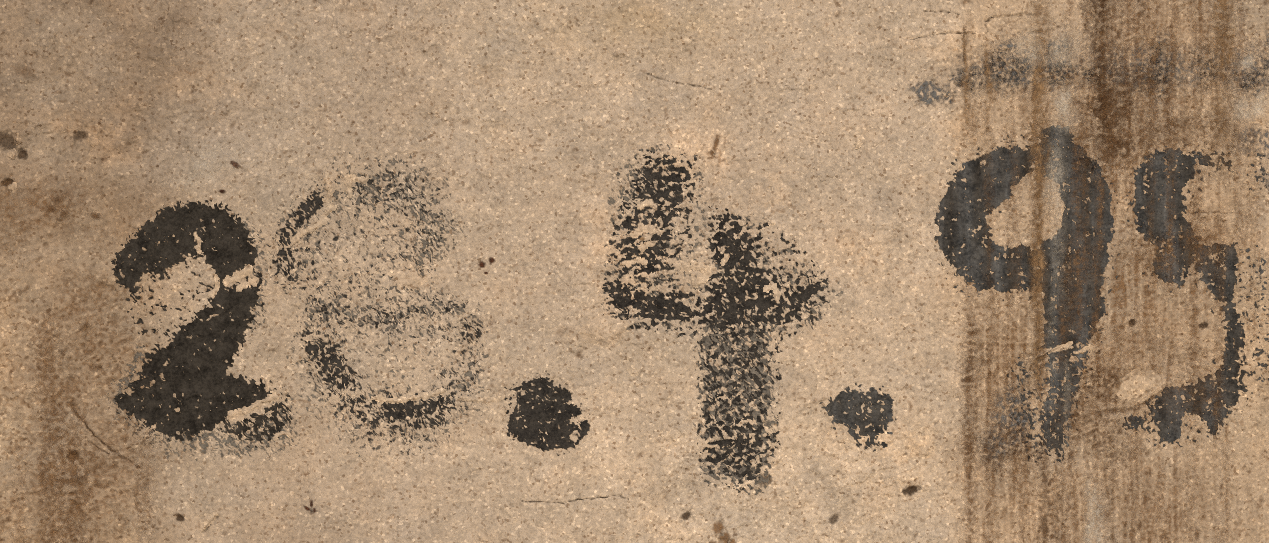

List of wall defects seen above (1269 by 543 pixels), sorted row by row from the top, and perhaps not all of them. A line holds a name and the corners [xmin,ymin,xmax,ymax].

water stain [1033,0,1195,213]
water stain [981,316,1107,543]
water stain [1072,234,1175,448]
water stain [1124,469,1182,543]